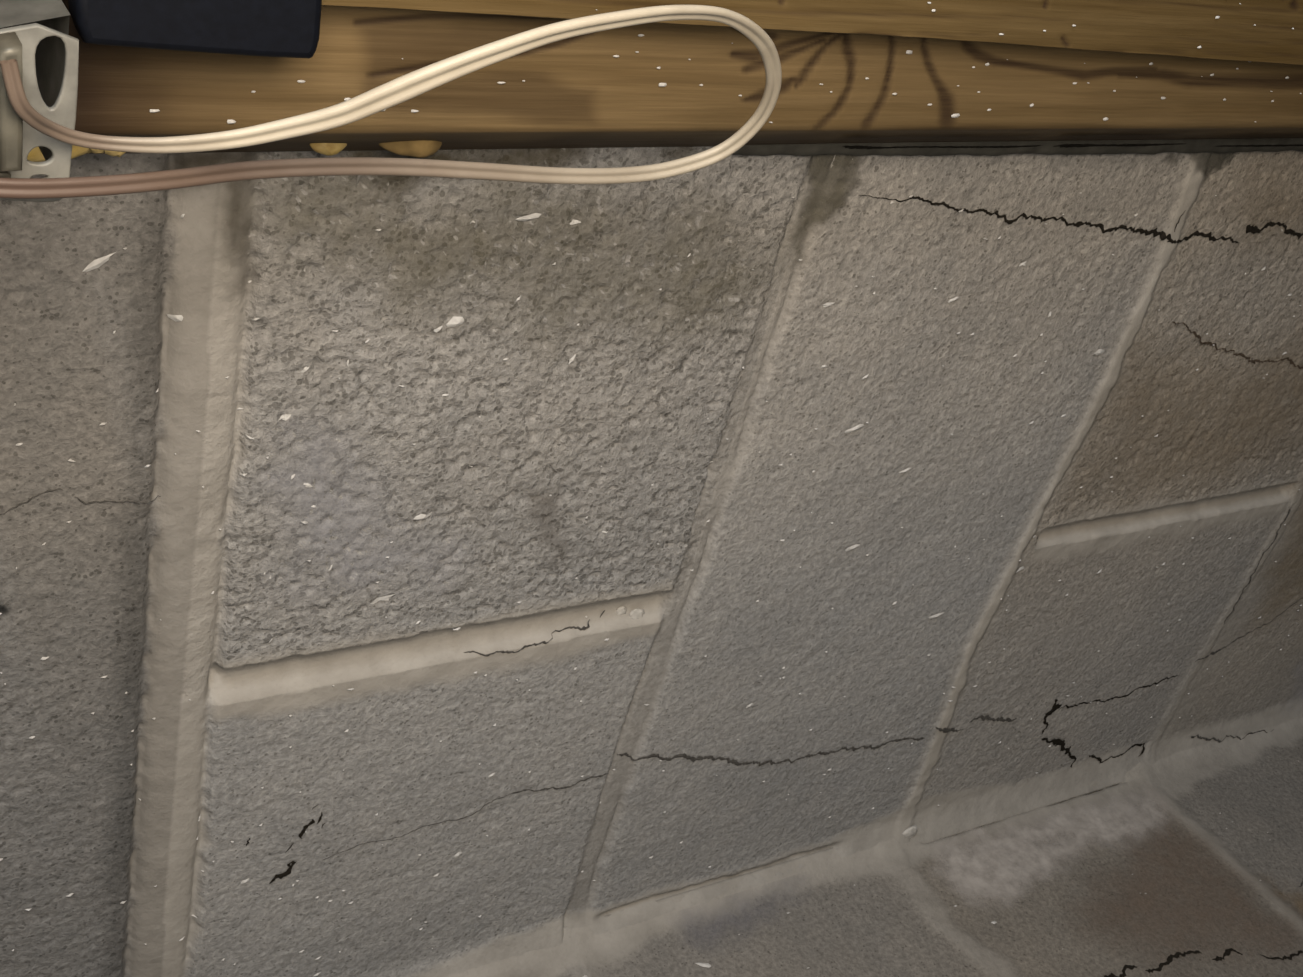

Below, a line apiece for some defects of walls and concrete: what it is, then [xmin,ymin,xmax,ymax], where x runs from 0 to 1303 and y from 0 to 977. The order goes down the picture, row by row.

crack [842,142,1303,150]
water stain [801,154,858,230]
crack [860,195,1303,244]
crack [324,507,1302,860]
crack [1104,948,1303,977]